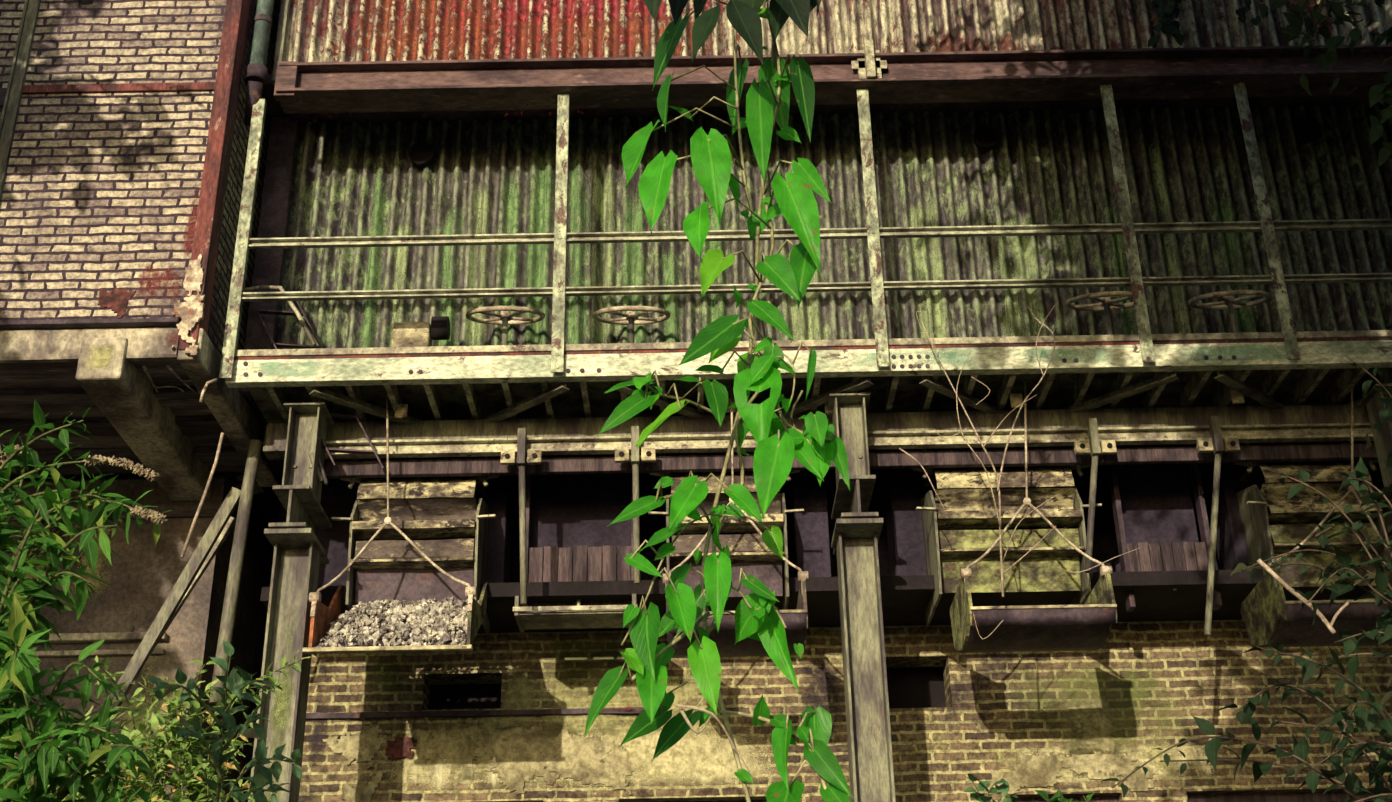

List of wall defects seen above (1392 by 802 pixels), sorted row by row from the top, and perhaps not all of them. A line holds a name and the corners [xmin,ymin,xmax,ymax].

rust [286,0,740,62]
rust [856,33,1056,53]
rust [184,191,198,253]
rust [139,266,179,301]
spalling [171,254,206,357]
flaking render [323,723,417,802]